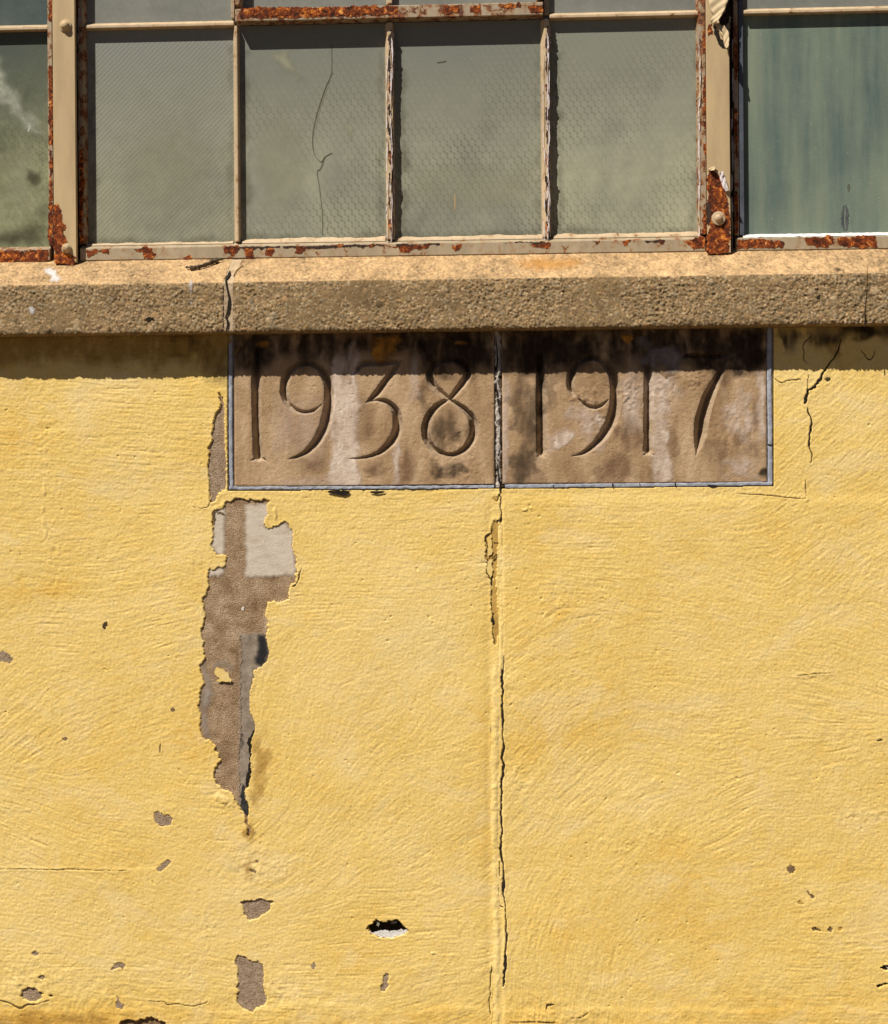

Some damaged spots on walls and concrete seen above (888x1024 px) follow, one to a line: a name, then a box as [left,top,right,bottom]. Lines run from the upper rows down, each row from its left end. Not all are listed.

rust [239,4,398,19]
rust [0,65,109,265]
rust [683,170,785,254]
rust [804,235,878,249]
crack [225,265,243,331]
water stain [0,328,767,485]
crack [748,267,875,499]
flaking render [198,393,297,837]
crack [489,656,508,1014]
spalling [241,899,273,920]
hole [368,919,407,938]
spalling [235,955,267,1012]